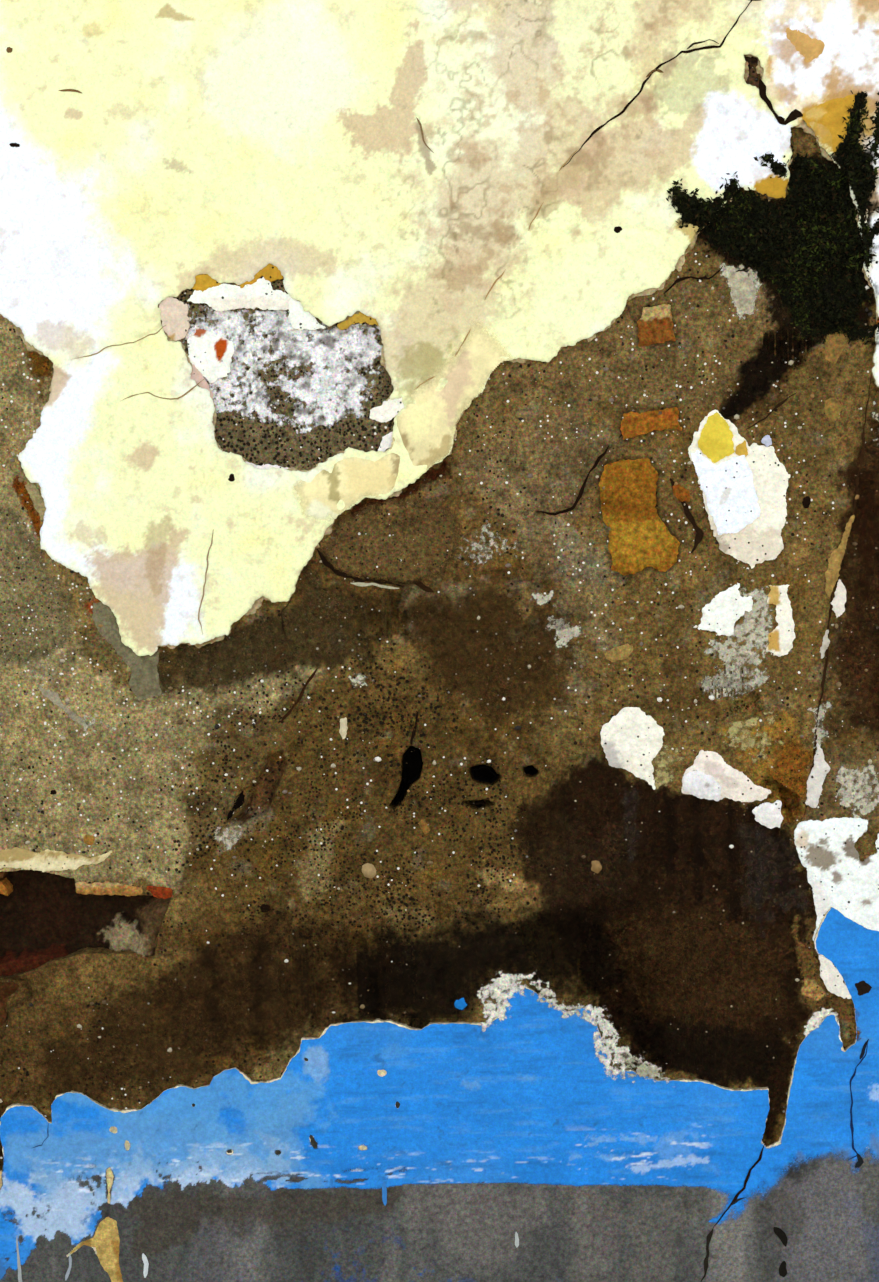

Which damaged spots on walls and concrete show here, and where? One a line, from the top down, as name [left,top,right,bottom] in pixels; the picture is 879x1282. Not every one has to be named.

crack [559,0,760,171]
crack [759,79,803,125]
damp [807,152,853,191]
crack [414,269,506,390]
damp [680,195,824,423]
damp [849,193,879,346]
spalling [0,237,879,1146]
damp [43,745,817,1146]
crack [849,1039,869,1168]
peeling [106,1167,114,1204]
crack [701,1144,765,1281]
crack [773,1227,788,1277]